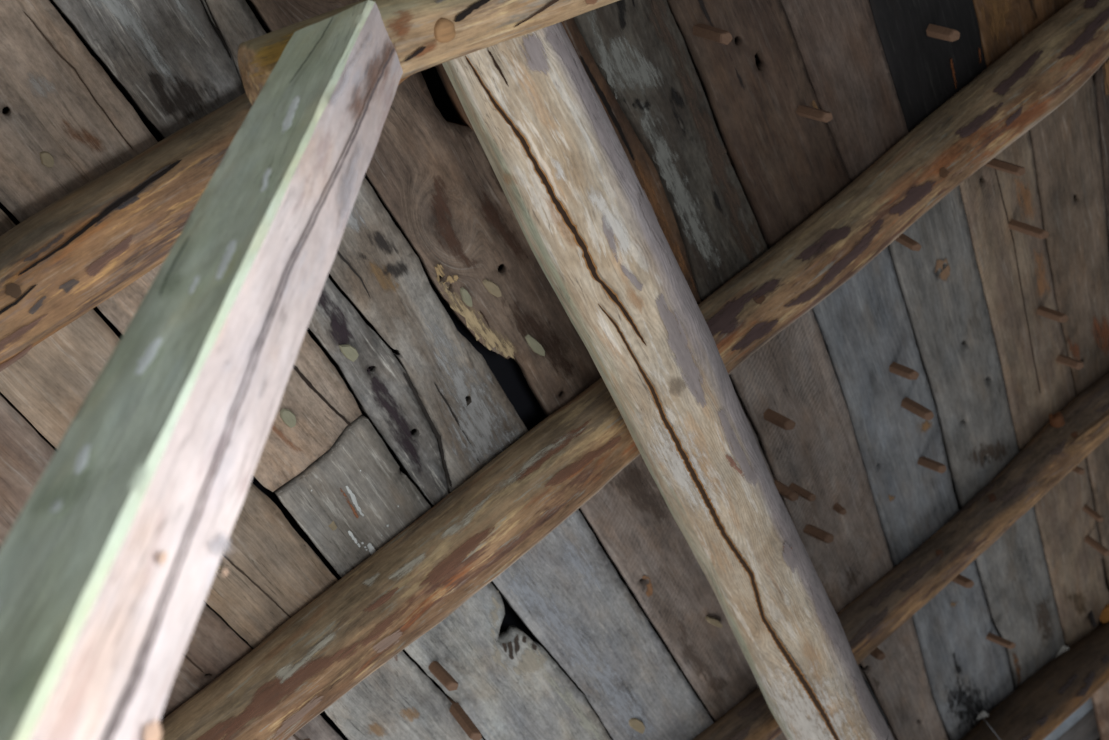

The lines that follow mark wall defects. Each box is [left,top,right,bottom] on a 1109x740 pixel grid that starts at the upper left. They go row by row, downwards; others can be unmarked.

crack [465,50,840,740]